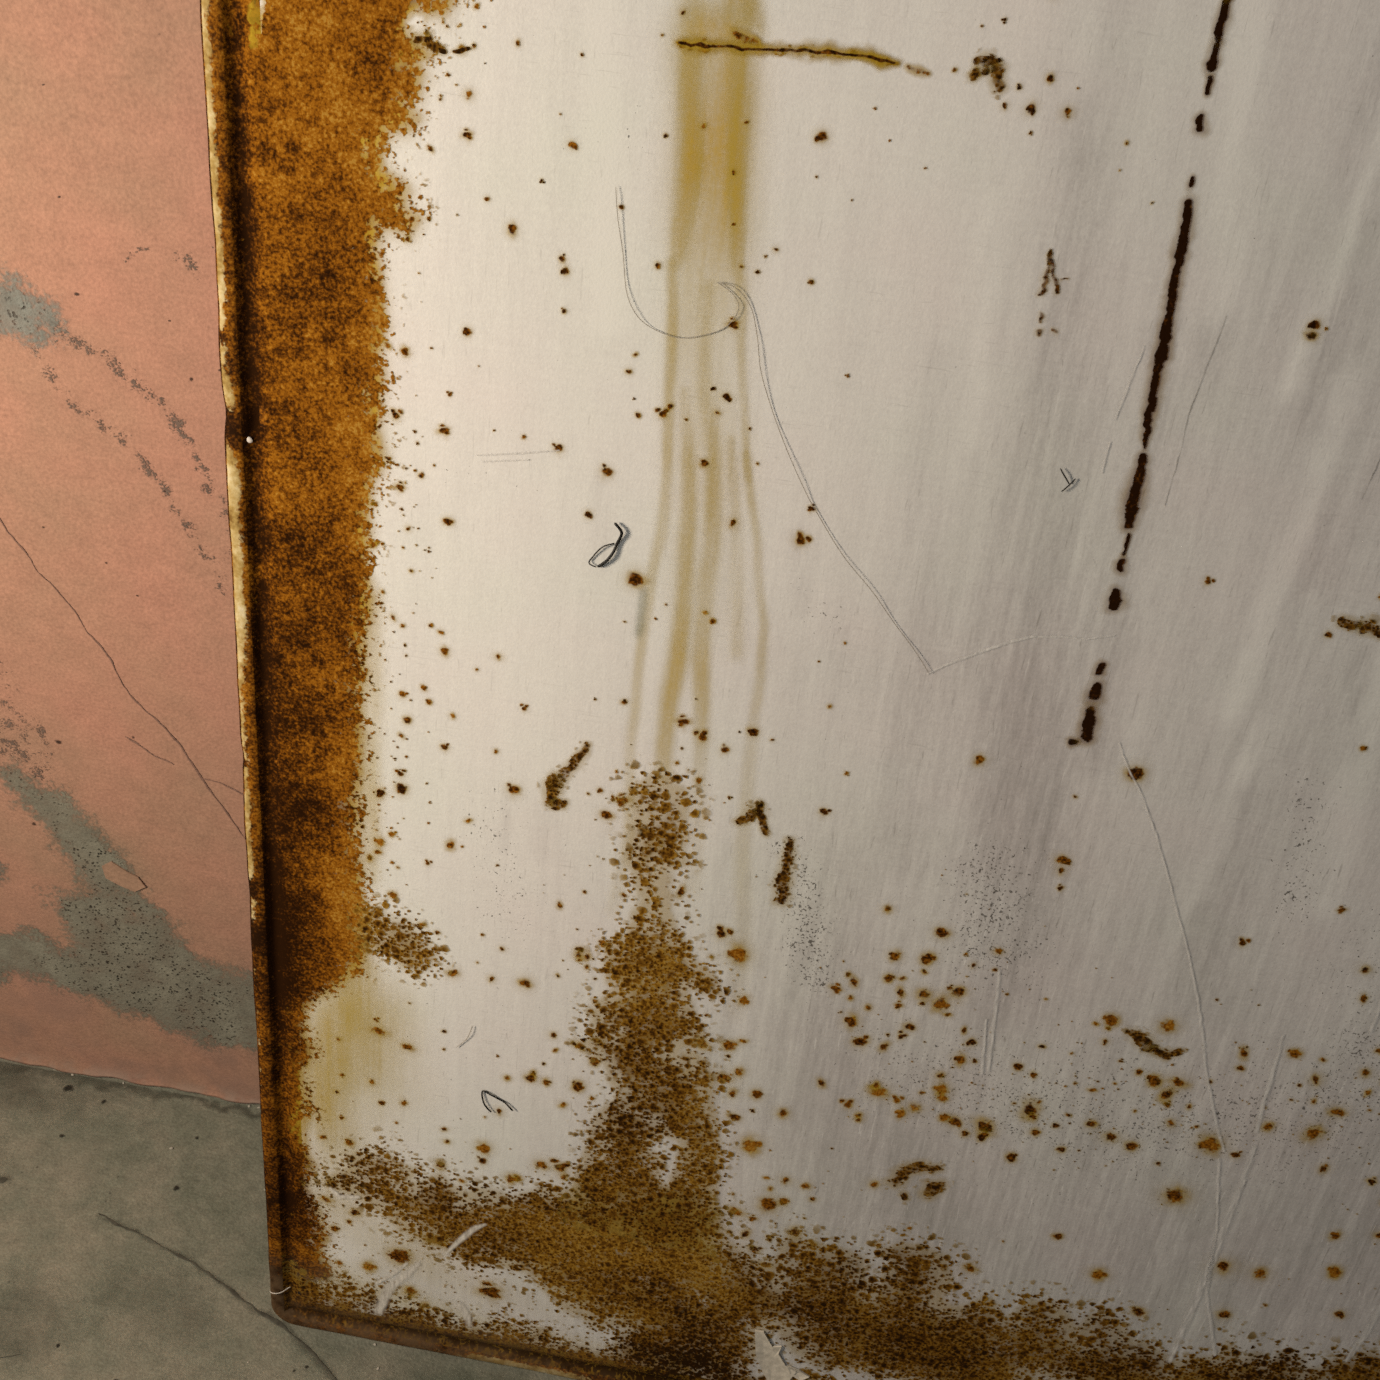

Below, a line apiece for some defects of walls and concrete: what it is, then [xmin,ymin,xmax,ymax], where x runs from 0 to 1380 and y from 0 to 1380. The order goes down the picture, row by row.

corrosion [969,53,1005,96]
corrosion [1037,249,1069,296]
corrosion [1324,616,1380,638]
corrosion [395,769,407,795]
corrosion [544,742,590,811]
corrosion [735,801,770,836]
corrosion [773,837,794,906]
corrosion [884,952,965,1016]
corrosion [830,972,915,1050]
corrosion [1093,1015,1184,1060]
corrosion [870,1073,993,1142]
corrosion [870,1161,945,1201]